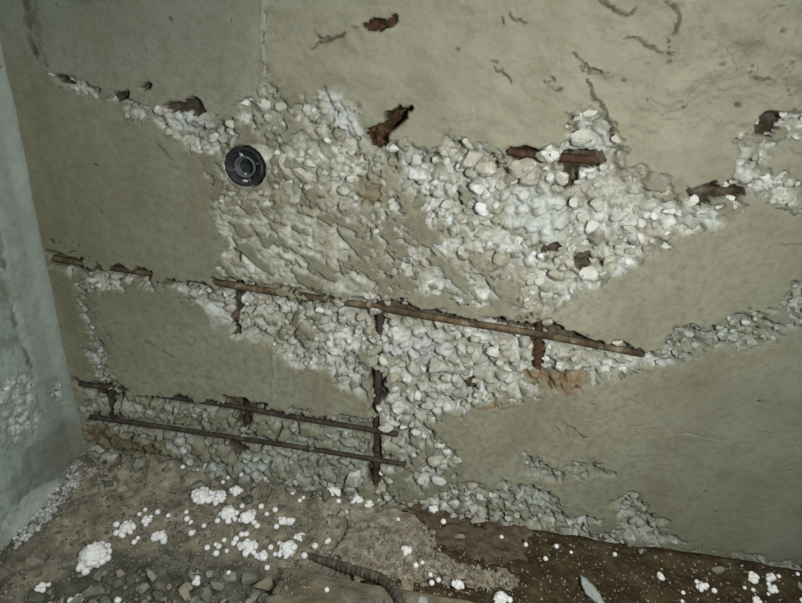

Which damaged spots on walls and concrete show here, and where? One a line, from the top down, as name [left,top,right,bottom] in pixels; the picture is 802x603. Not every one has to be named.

crack [310,26,357,52]
crack [501,12,527,24]
crack [599,0,683,56]
spalling [48,73,77,84]
spalling [113,90,207,119]
crack [492,60,513,84]
crack [573,52,616,145]
flaking render [213,87,386,209]
flaking render [223,105,802,534]
rust [81,422,173,460]
spalling [165,394,296,476]
flaking render [604,492,660,547]